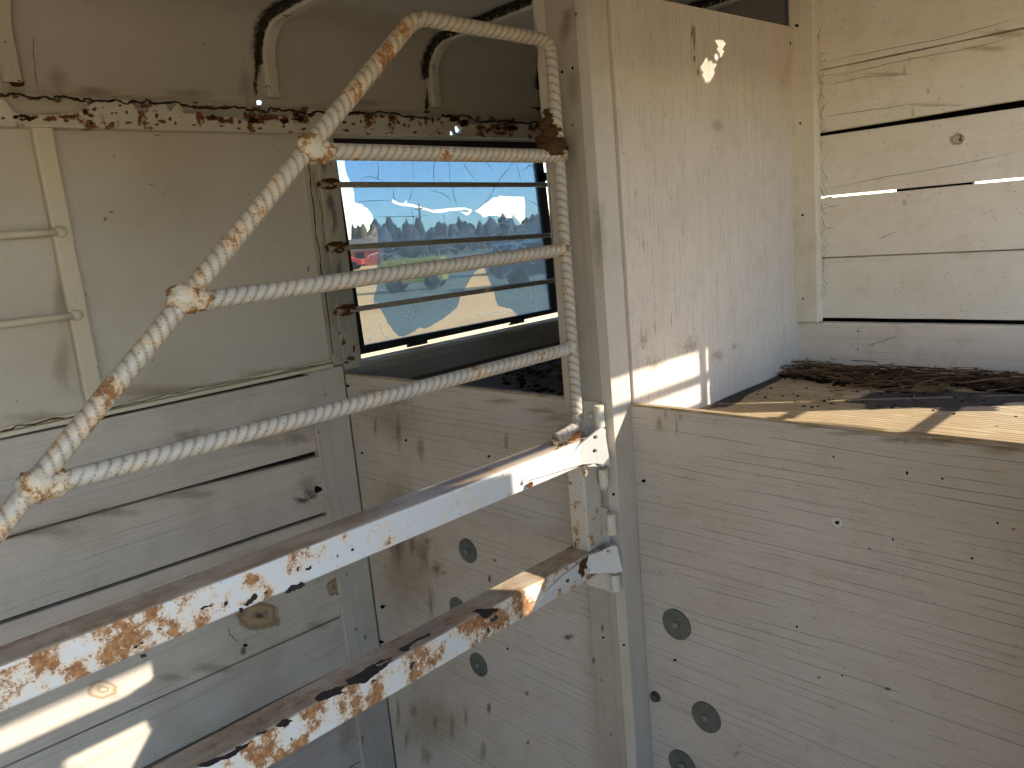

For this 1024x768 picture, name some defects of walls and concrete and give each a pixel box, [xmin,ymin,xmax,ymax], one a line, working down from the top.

crack [0,22,540,131]
corrosion [19,97,177,126]
corrosion [192,105,315,130]
peeling [285,565,312,593]
corrosion [558,556,590,592]
peeling [200,591,268,613]
peeling [472,608,499,634]
peeling [314,633,431,702]
peeling [197,719,292,767]